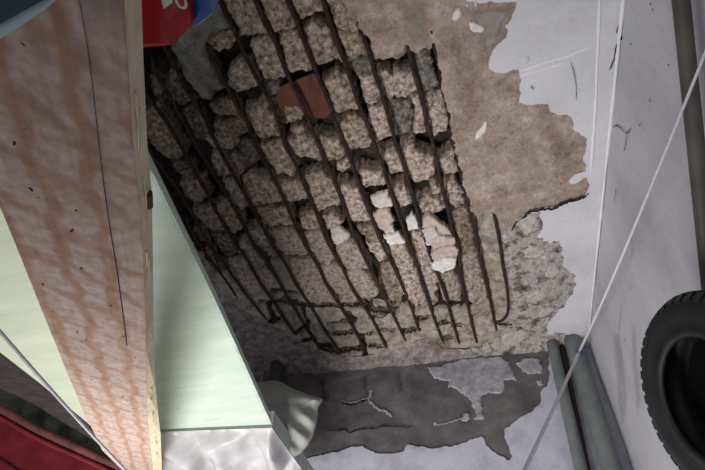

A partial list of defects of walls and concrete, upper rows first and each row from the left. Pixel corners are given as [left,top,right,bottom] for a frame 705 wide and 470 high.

spalling [143,0,589,378]
crack [512,193,589,231]
crack [325,390,412,433]
damp [282,351,550,460]